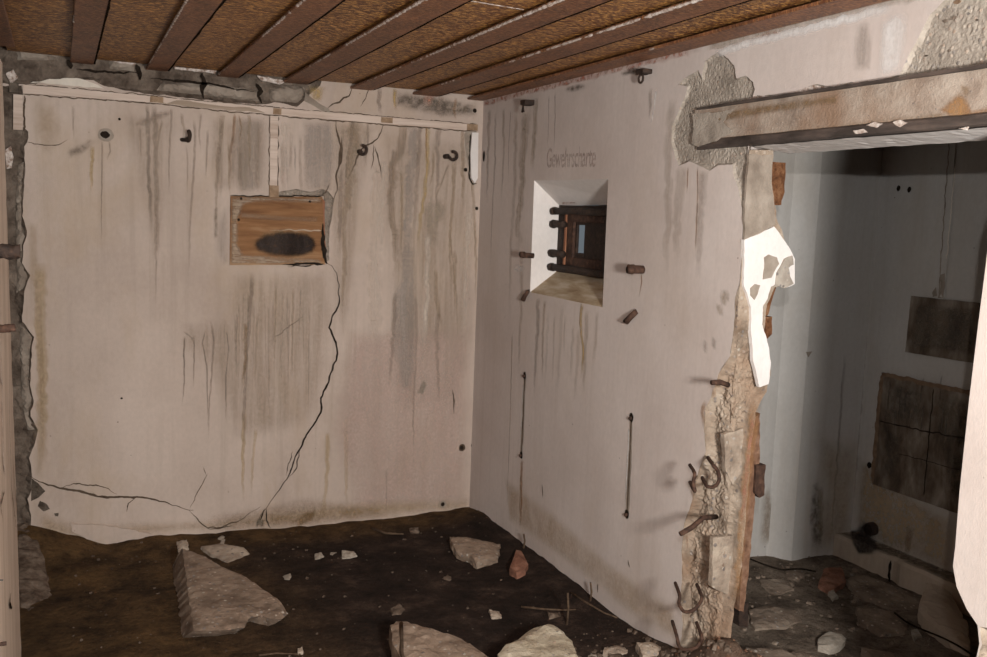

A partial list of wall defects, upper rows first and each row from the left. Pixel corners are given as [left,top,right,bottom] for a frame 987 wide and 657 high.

spalling [885,0,987,79]
flaking render [0,46,334,525]
crack [1,265,340,529]
spalling [671,52,867,651]
flaking render [70,523,151,544]
spalling [978,627,987,657]